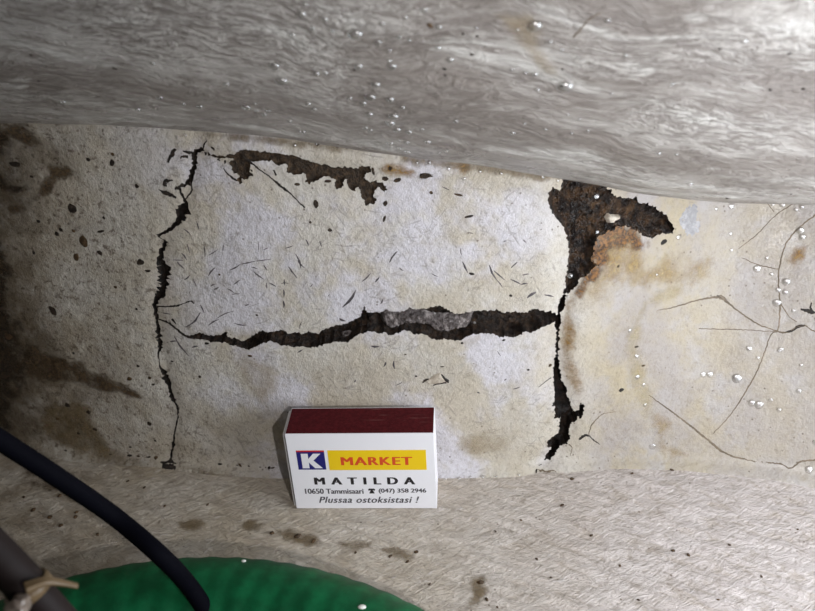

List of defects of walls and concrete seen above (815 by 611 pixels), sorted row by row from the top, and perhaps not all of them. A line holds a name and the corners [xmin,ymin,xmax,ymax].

damp [54,228,88,261]
crack [152,140,613,473]
corrosion [576,226,643,297]
crack [649,204,815,469]